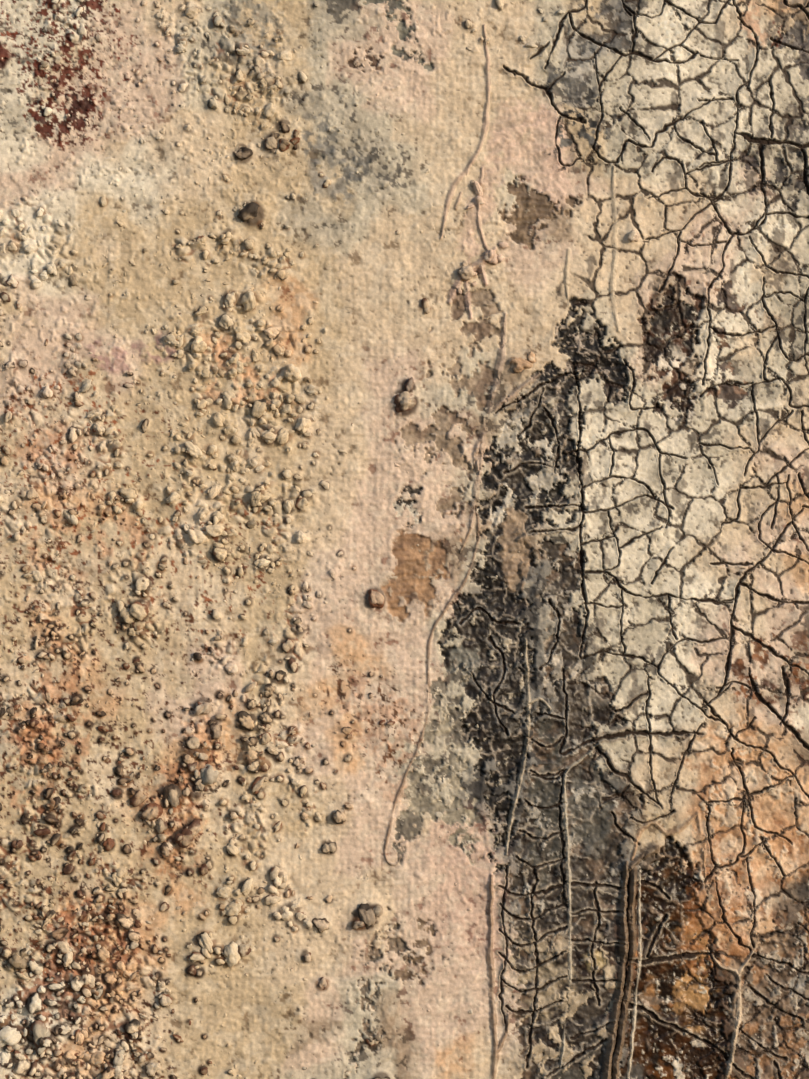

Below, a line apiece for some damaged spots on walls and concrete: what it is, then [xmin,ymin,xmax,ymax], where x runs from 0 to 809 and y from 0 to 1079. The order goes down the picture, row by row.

rust [0,0,99,140]
rust [79,0,104,21]
peeling [381,268,763,1079]
peeling [618,836,809,1079]